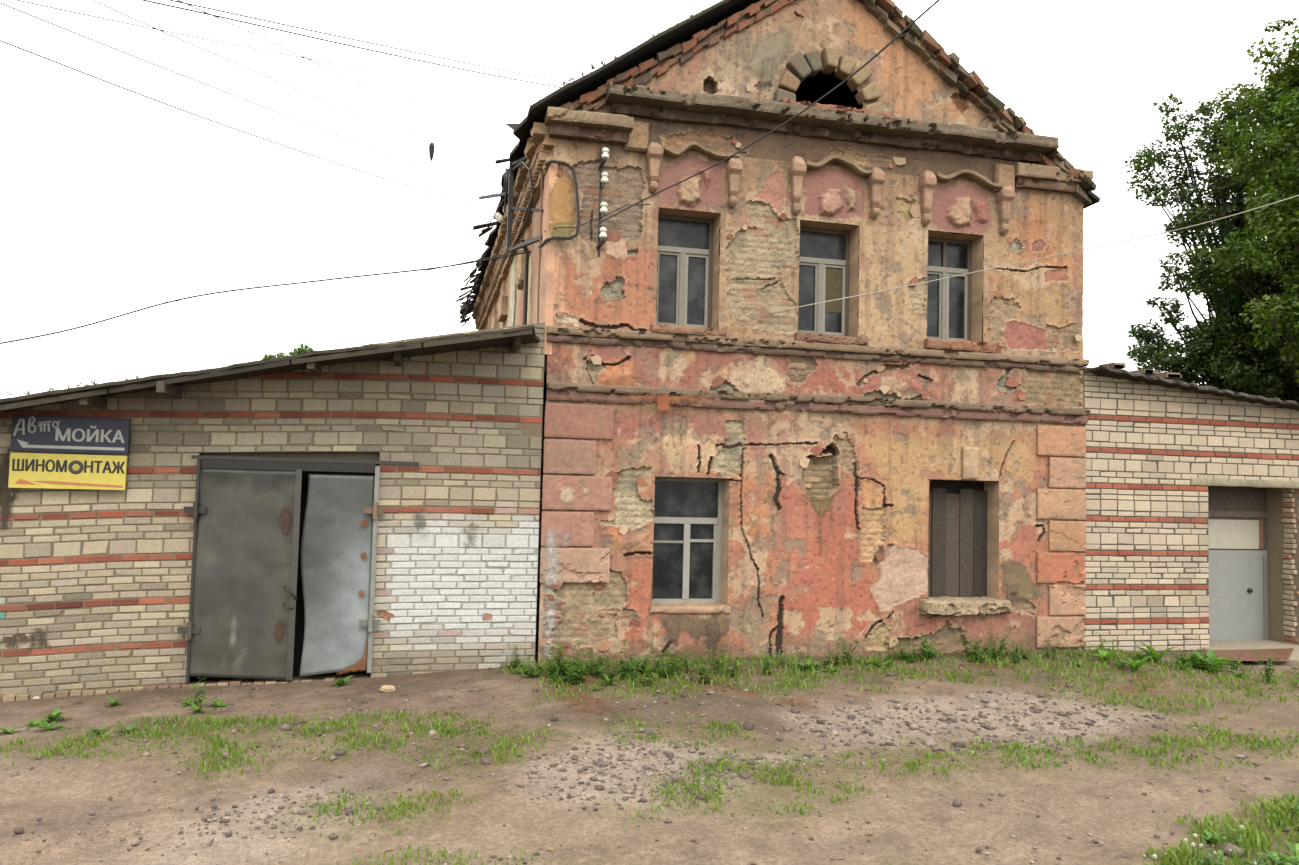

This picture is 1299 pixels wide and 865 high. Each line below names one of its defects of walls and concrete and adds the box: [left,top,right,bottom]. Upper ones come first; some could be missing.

flaking render [557,159,646,300]
flaking render [725,171,800,334]
flaking render [586,355,606,383]
flaking render [709,375,739,392]
flaking render [856,363,929,401]
flaking render [988,292,1084,408]
flaking render [711,419,747,478]
flaking render [799,432,860,497]
flaking render [600,465,654,535]
flaking render [541,531,640,657]
peeling [858,506,971,654]
rust [339,641,368,674]